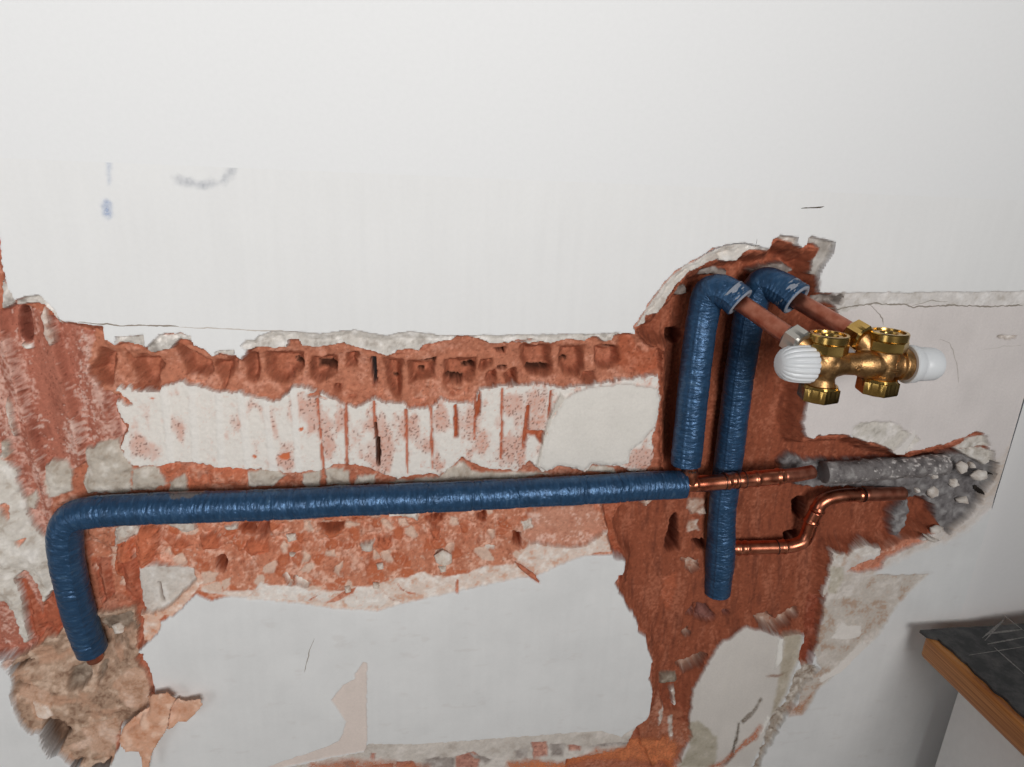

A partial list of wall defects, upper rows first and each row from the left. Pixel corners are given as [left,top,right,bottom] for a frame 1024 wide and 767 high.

spalling [0,235,1024,767]